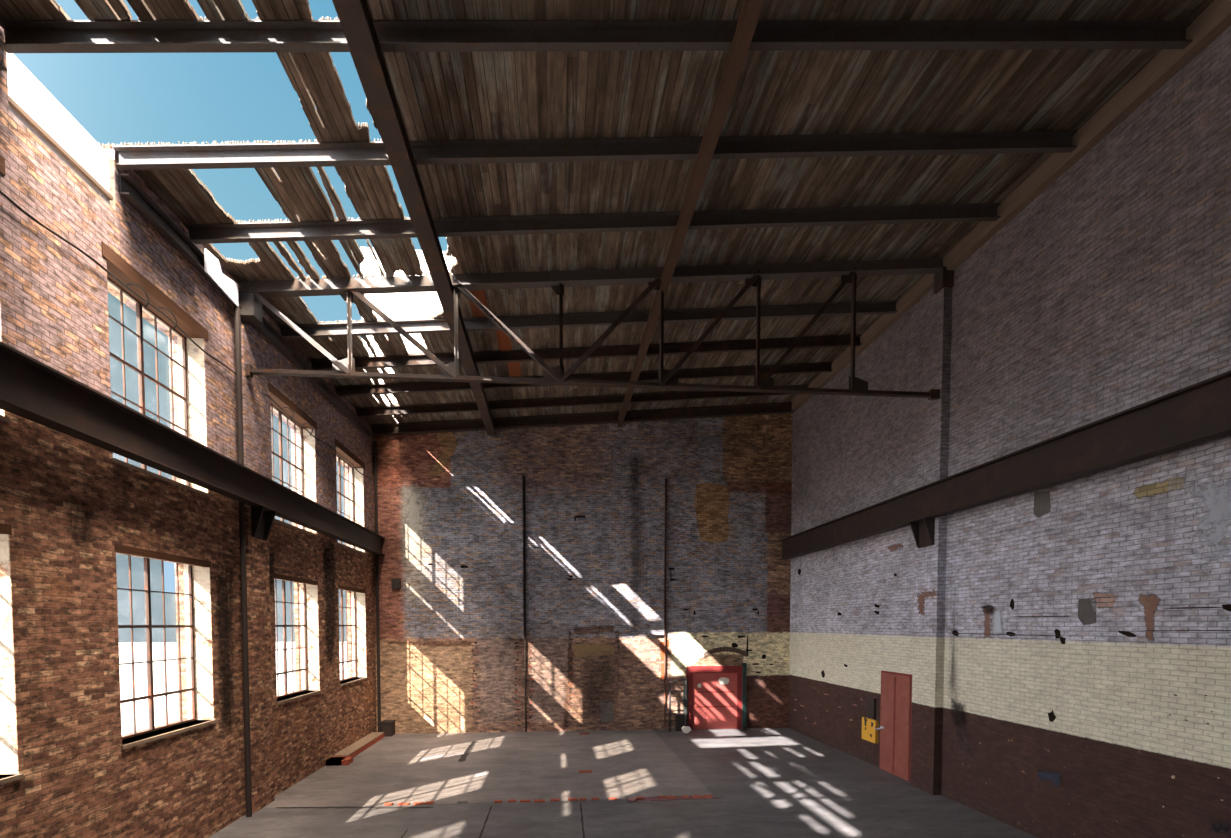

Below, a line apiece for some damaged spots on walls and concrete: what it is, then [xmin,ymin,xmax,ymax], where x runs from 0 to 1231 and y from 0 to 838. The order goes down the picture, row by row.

rust [983,605,997,638]
rust [1138,594,1160,640]